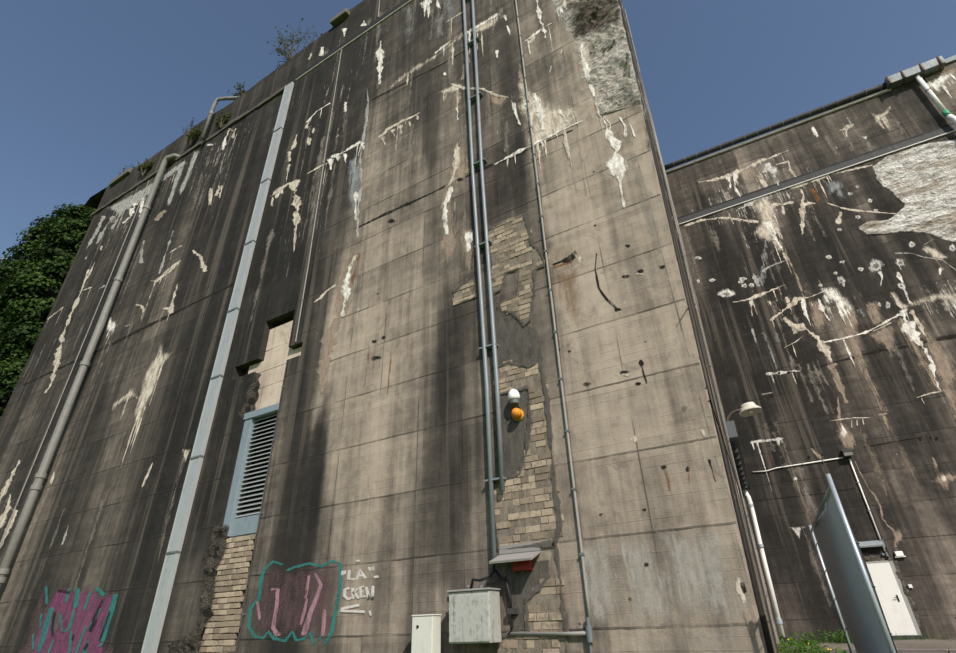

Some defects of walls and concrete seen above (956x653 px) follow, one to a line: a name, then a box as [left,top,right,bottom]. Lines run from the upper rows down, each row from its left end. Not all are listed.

spalling [552,0,701,266]
peeling [855,135,956,258]
flaking render [453,212,582,326]
crack [594,253,621,311]
leakage [685,150,956,418]
leakage [0,460,20,548]
flaking render [490,360,570,653]
spalling [168,525,229,653]